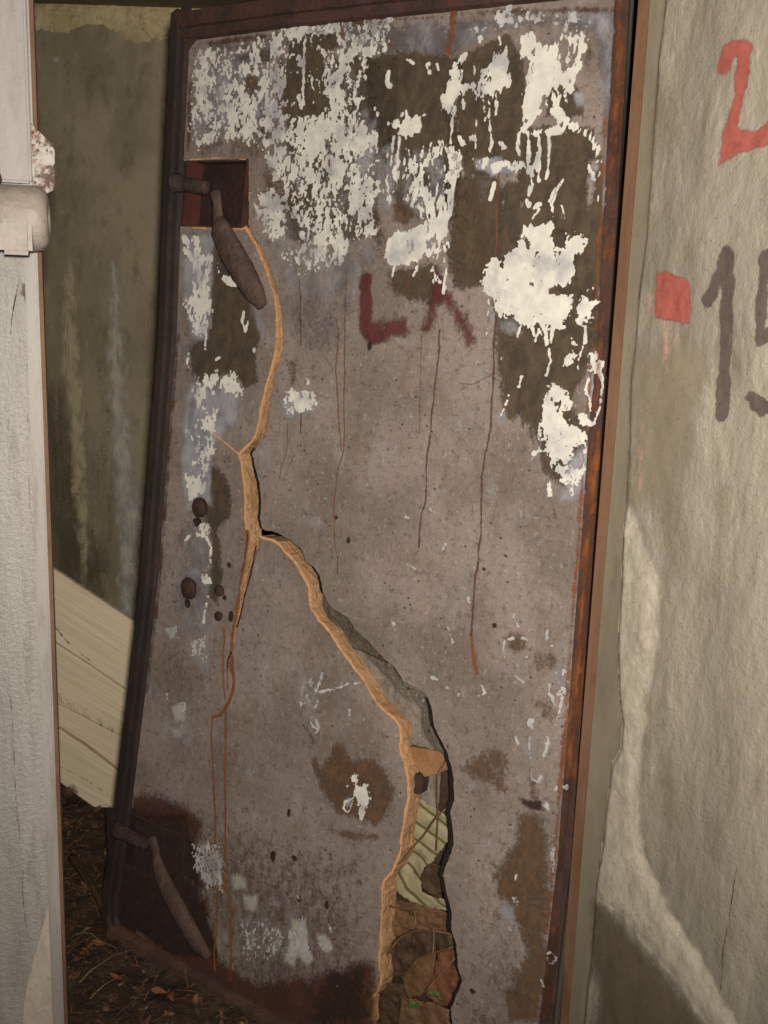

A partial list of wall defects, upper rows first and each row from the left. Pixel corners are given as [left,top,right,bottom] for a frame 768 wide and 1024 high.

rust [601,25,624,189]
peeling [187,5,613,501]
peeling [180,234,264,638]
rust [118,627,376,1024]
leakage [191,840,333,966]
crack [189,157,462,1024]
peeling [312,745,395,839]
spalling [322,594,444,754]
leakage [467,751,508,791]
leakage [502,613,569,813]
rust [558,432,602,800]